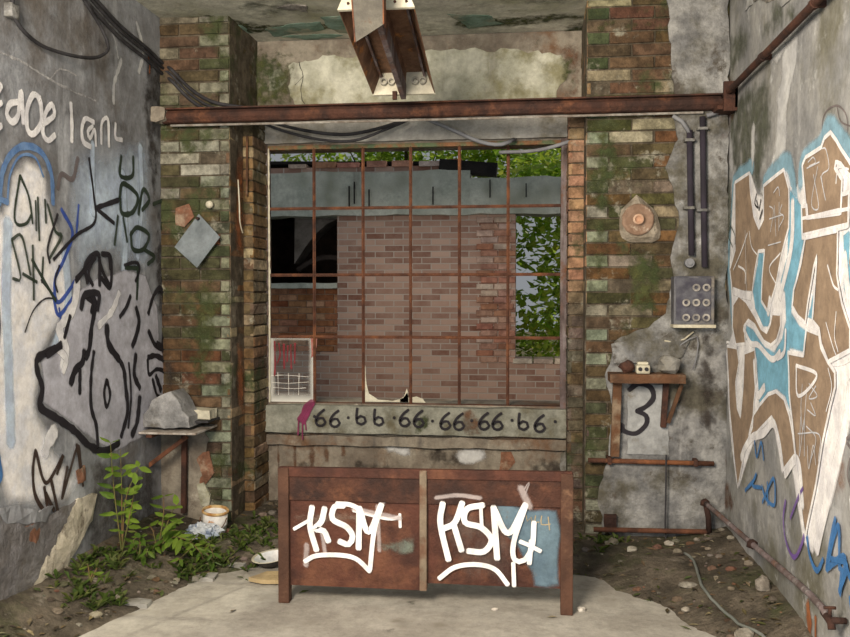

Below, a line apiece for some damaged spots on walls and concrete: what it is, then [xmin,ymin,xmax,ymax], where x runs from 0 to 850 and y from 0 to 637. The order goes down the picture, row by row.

flaking render [269,48,568,105]
damp [136,21,161,191]
flaking render [611,331,689,365]
rust [806,601,817,637]